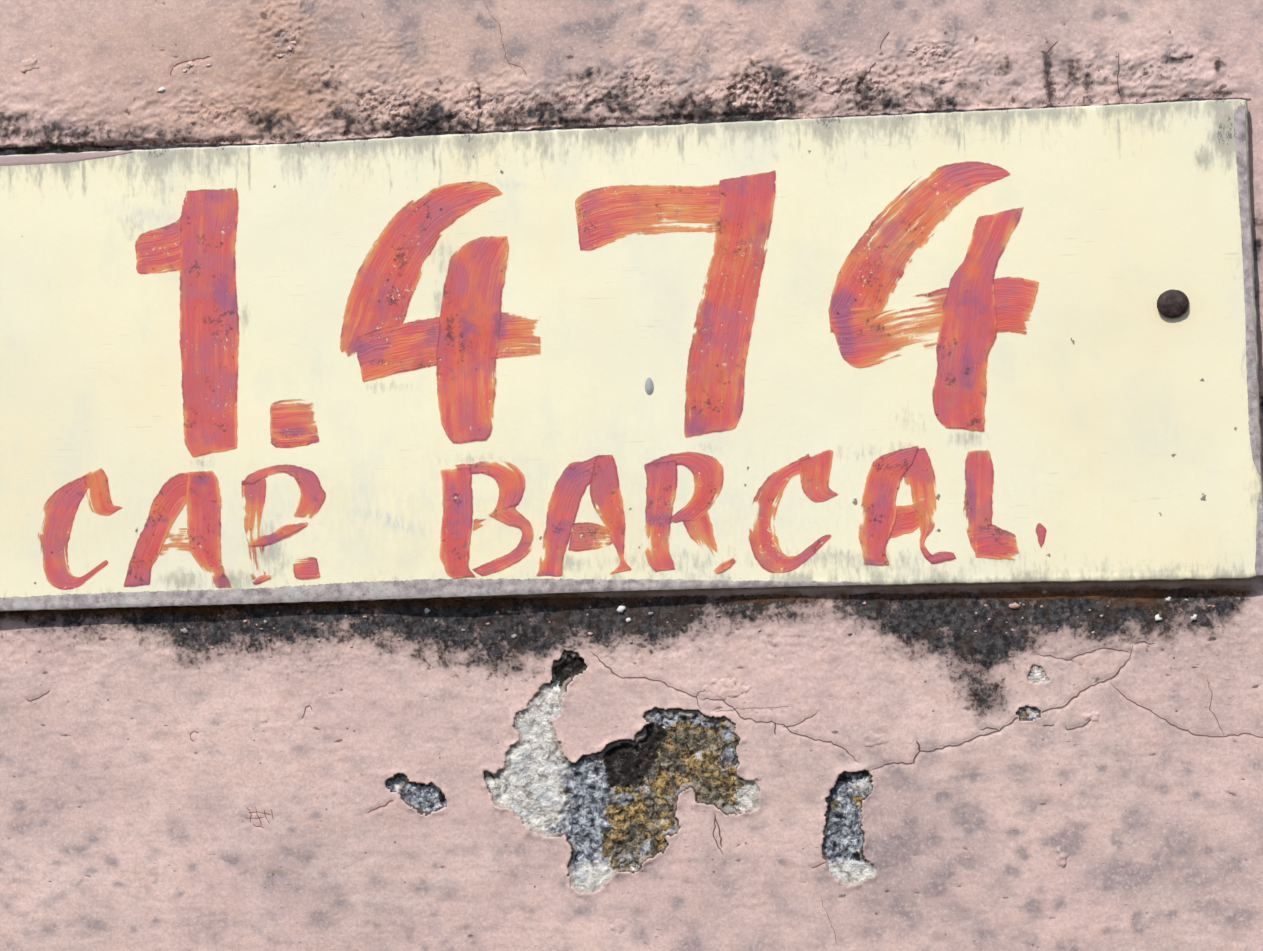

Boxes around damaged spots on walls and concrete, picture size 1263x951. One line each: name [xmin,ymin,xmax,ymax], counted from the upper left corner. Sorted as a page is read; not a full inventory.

mould [0,61,804,156]
mould [820,41,1251,118]
water stain [1254,218,1263,260]
water stain [0,588,1249,716]
crack [591,641,1263,771]
flaking render [385,773,447,816]
peeling [484,650,760,893]
flaking render [822,770,876,886]